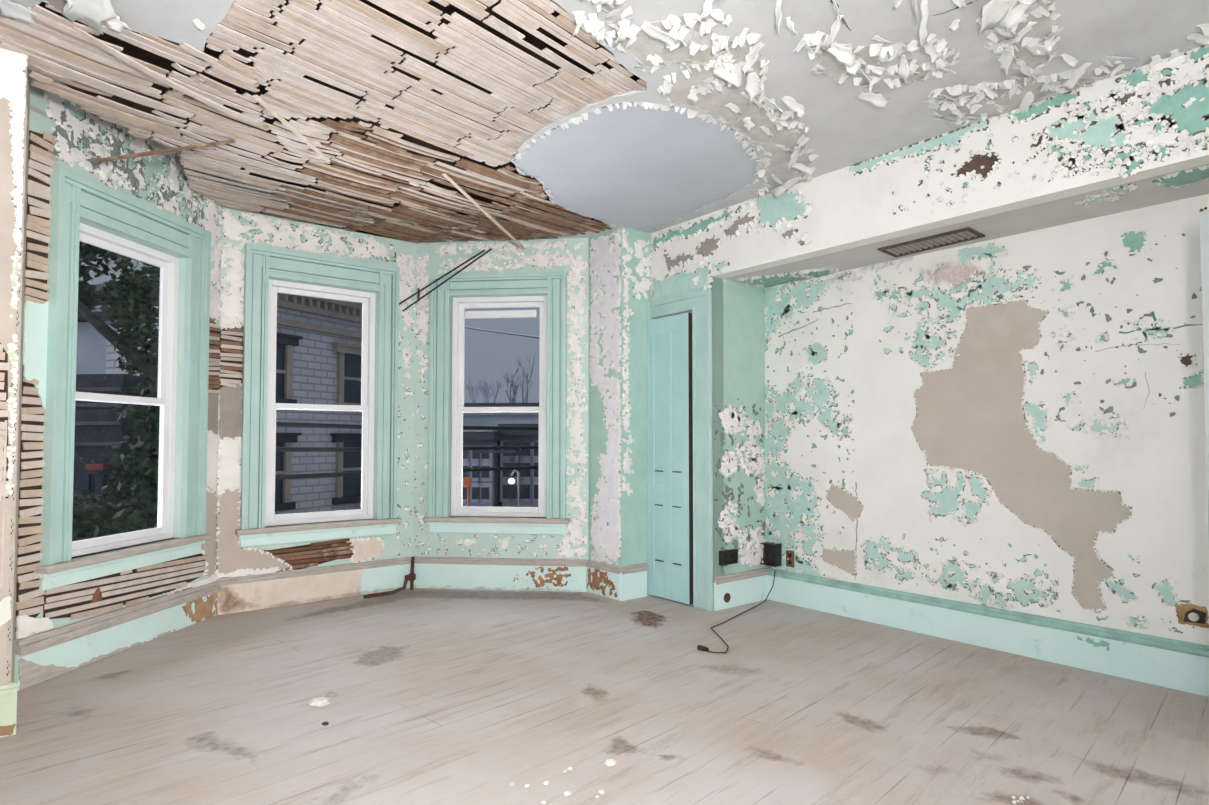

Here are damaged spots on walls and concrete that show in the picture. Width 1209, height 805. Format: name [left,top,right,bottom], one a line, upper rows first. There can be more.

peeling [0,0,131,34]
peeling [0,41,48,495]
flaking render [42,0,1209,634]
corrosion [513,566,618,597]
flaking render [0,596,53,639]
peeling [1077,636,1125,651]